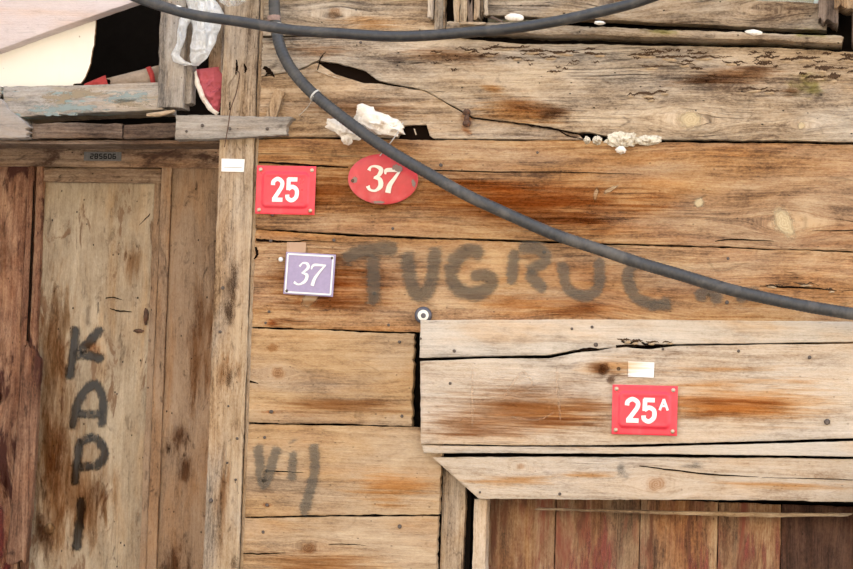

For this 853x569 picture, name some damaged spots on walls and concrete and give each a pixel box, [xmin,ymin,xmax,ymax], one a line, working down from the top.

crack [235,60,275,77]
crack [317,52,401,87]
crack [471,118,584,139]
crack [576,341,660,352]